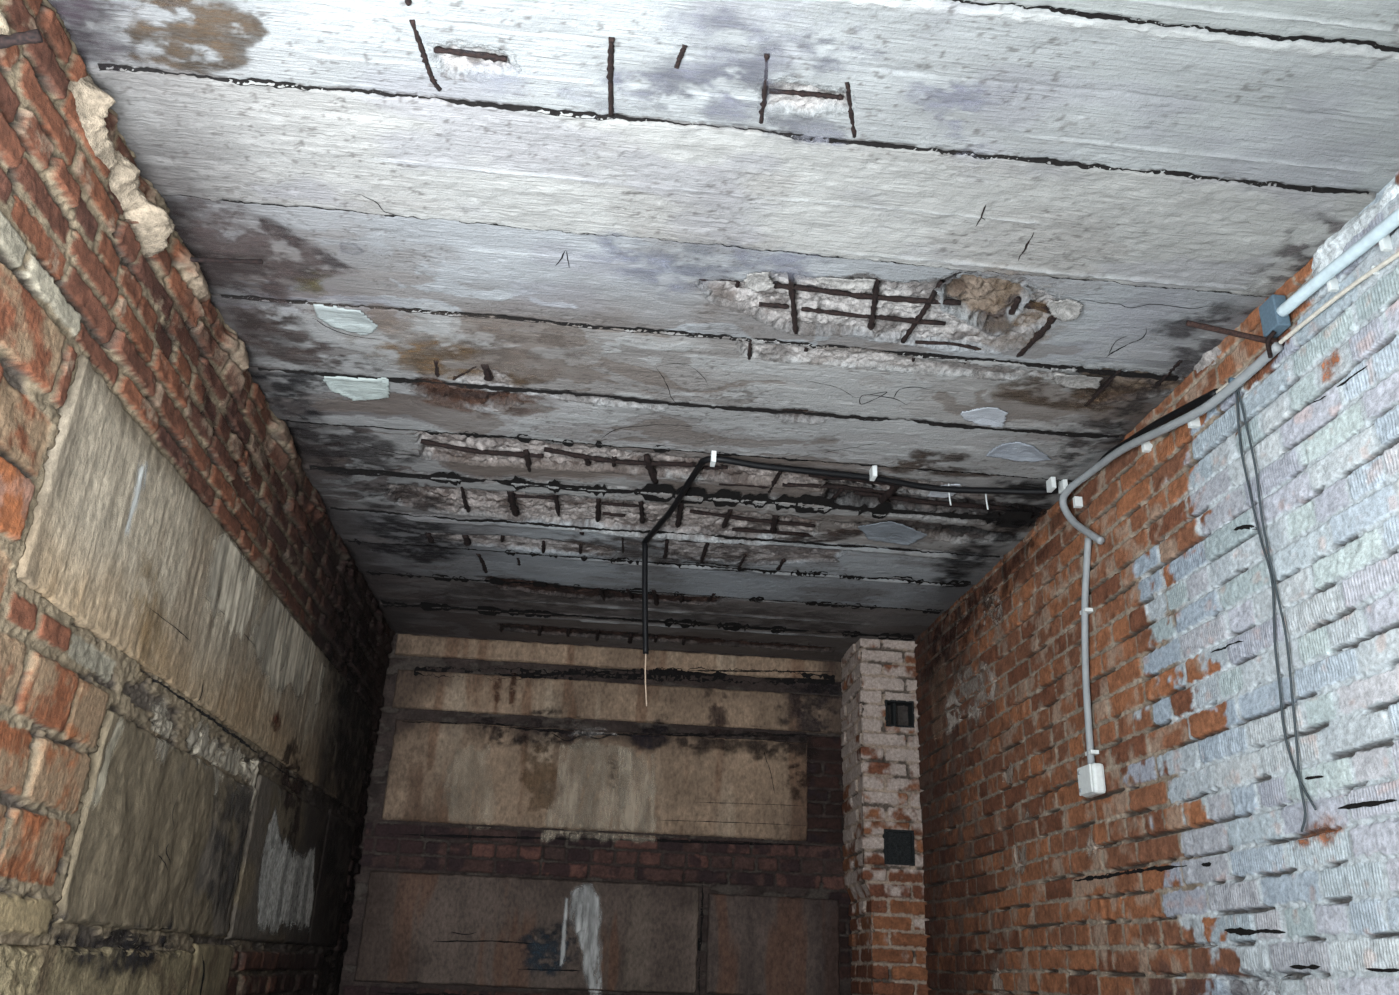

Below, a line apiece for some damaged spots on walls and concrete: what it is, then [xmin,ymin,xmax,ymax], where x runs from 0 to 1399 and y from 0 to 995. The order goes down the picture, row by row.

leakage [48,0,267,73]
crack [952,0,1399,53]
crack [97,63,1369,194]
leakage [174,206,417,475]
leakage [377,320,538,386]
spalling [688,270,1190,407]
leakage [365,484,454,509]
spalling [378,429,1036,606]
leakage [893,450,989,477]
crack [1338,799,1397,809]
crack [1224,927,1286,936]
crack [1366,966,1399,974]